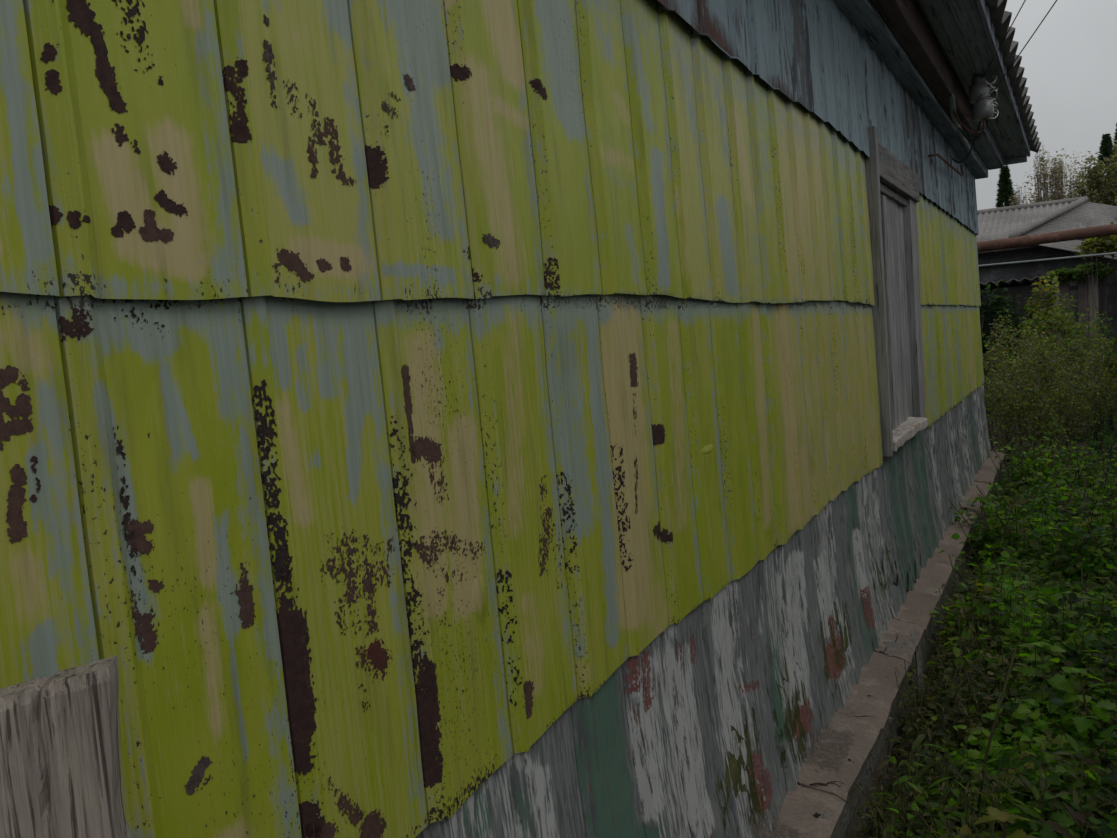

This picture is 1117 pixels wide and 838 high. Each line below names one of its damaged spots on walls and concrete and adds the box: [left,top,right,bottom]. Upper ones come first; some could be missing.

corrosion [40,42,62,95]
corrosion [52,0,164,154]
corrosion [222,57,252,143]
corrosion [262,14,416,188]
corrosion [48,205,91,229]
corrosion [111,189,188,243]
corrosion [272,248,352,283]
corrosion [0,365,34,450]
corrosion [6,456,41,544]
corrosion [113,426,165,654]
corrosion [252,380,387,838]
corrosion [321,364,485,788]